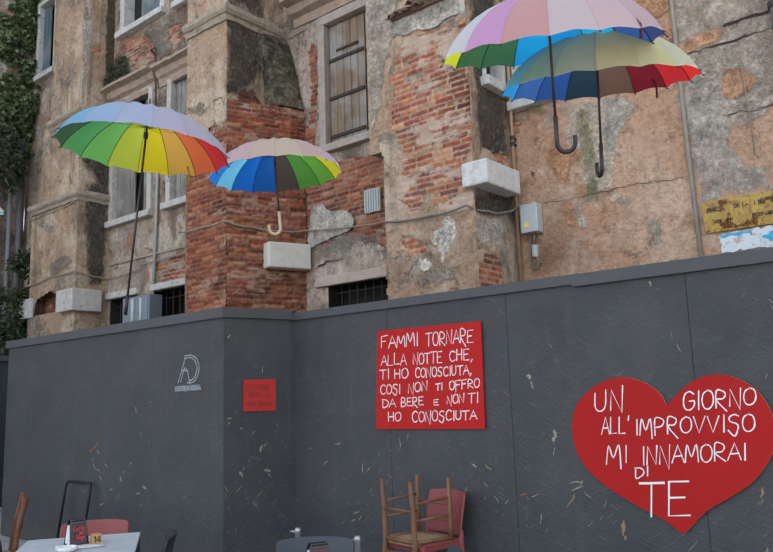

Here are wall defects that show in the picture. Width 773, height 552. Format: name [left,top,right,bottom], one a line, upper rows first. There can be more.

damp [227,20,262,101]
spalling [305,0,508,254]
crack [544,177,679,203]